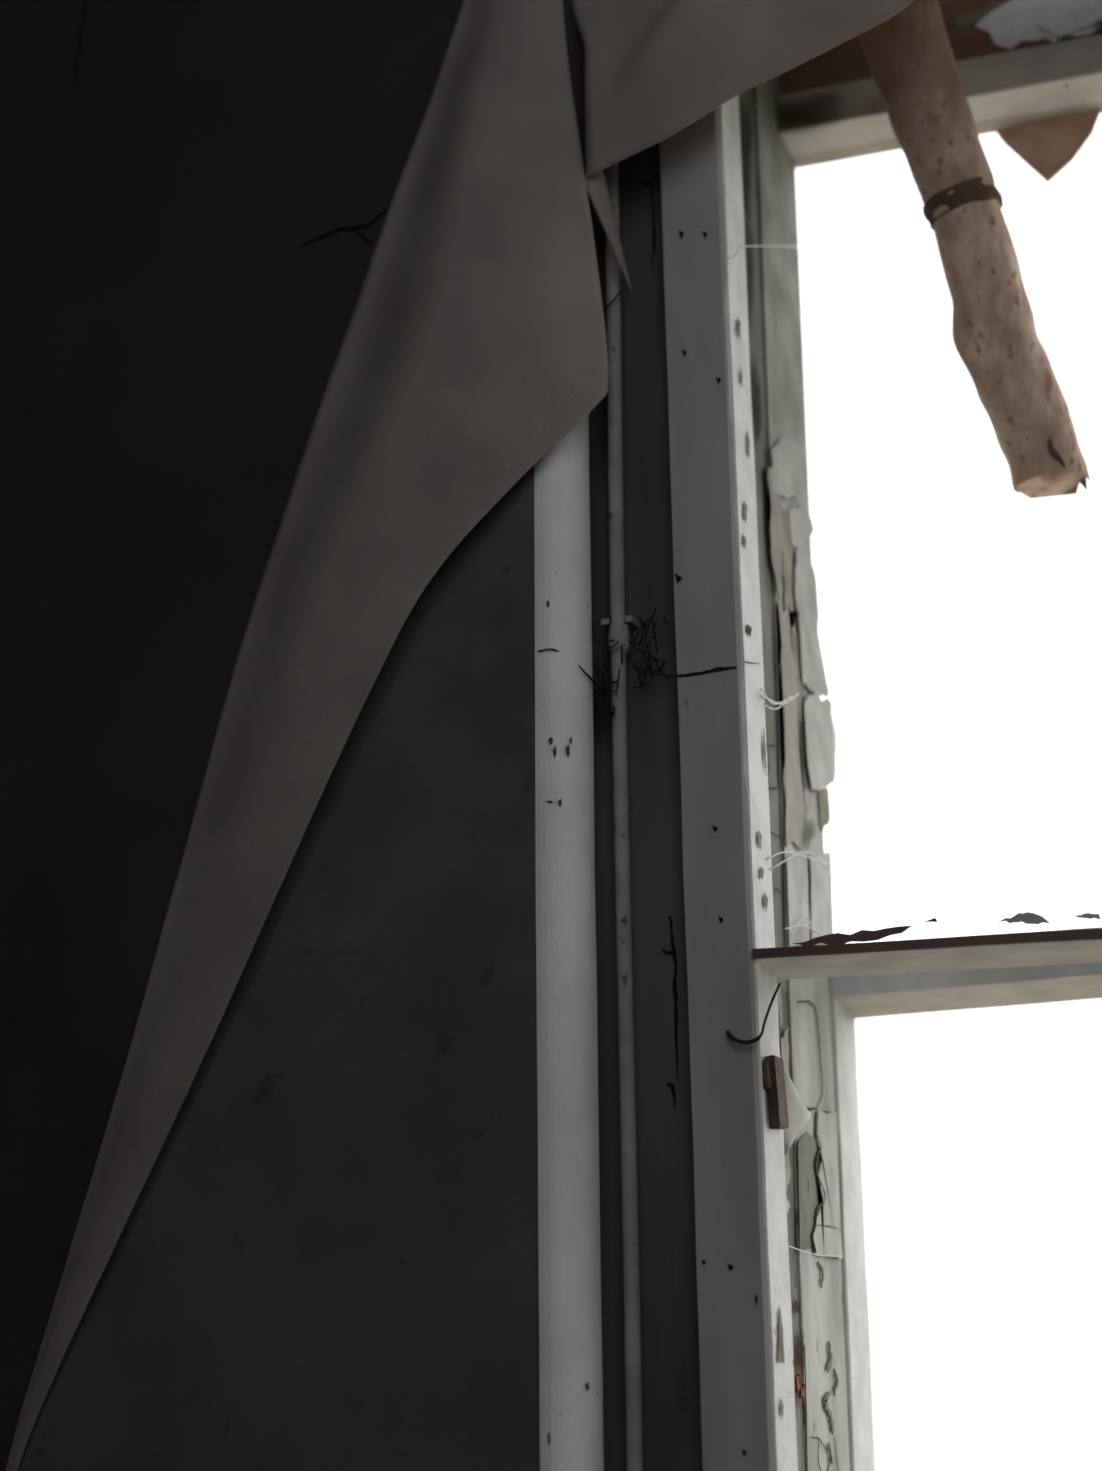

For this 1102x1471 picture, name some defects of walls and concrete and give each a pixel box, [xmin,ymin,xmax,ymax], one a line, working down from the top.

peeling [953,0,1102,50]
peeling [763,438,938,947]
peeling [18,466,572,1471]
spalling [662,915,679,1108]
peeling [758,830,768,911]
crack [786,990,823,1112]
peeling [997,912,1050,925]
peeling [1072,912,1101,920]
peeling [785,1111,843,1288]
rust [793,1335,805,1404]
crack [804,1345,839,1471]
peeling [823,1341,839,1465]